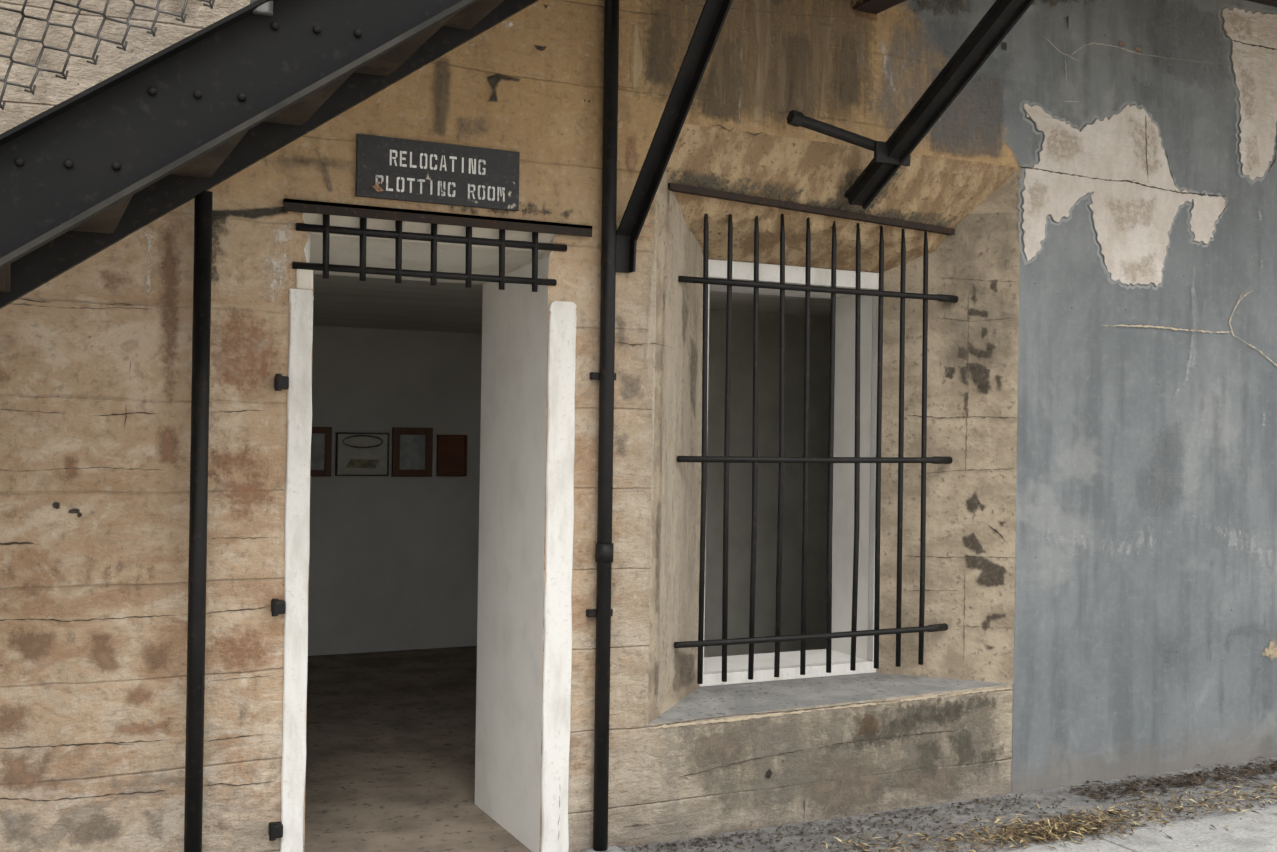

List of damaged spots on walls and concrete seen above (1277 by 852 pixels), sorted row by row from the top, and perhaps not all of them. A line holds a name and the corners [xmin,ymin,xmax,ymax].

peeling [1218,4,1277,185]
peeling [1017,100,1228,290]
crack [1101,291,1277,366]